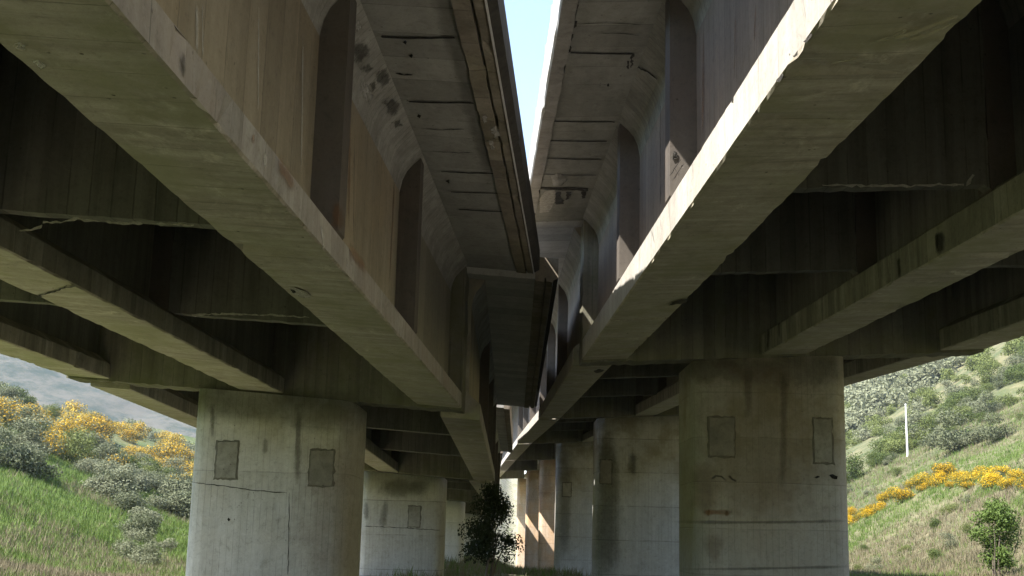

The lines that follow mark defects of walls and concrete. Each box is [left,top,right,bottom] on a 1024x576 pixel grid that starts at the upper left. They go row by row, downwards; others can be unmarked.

spalling [539,187,588,213]